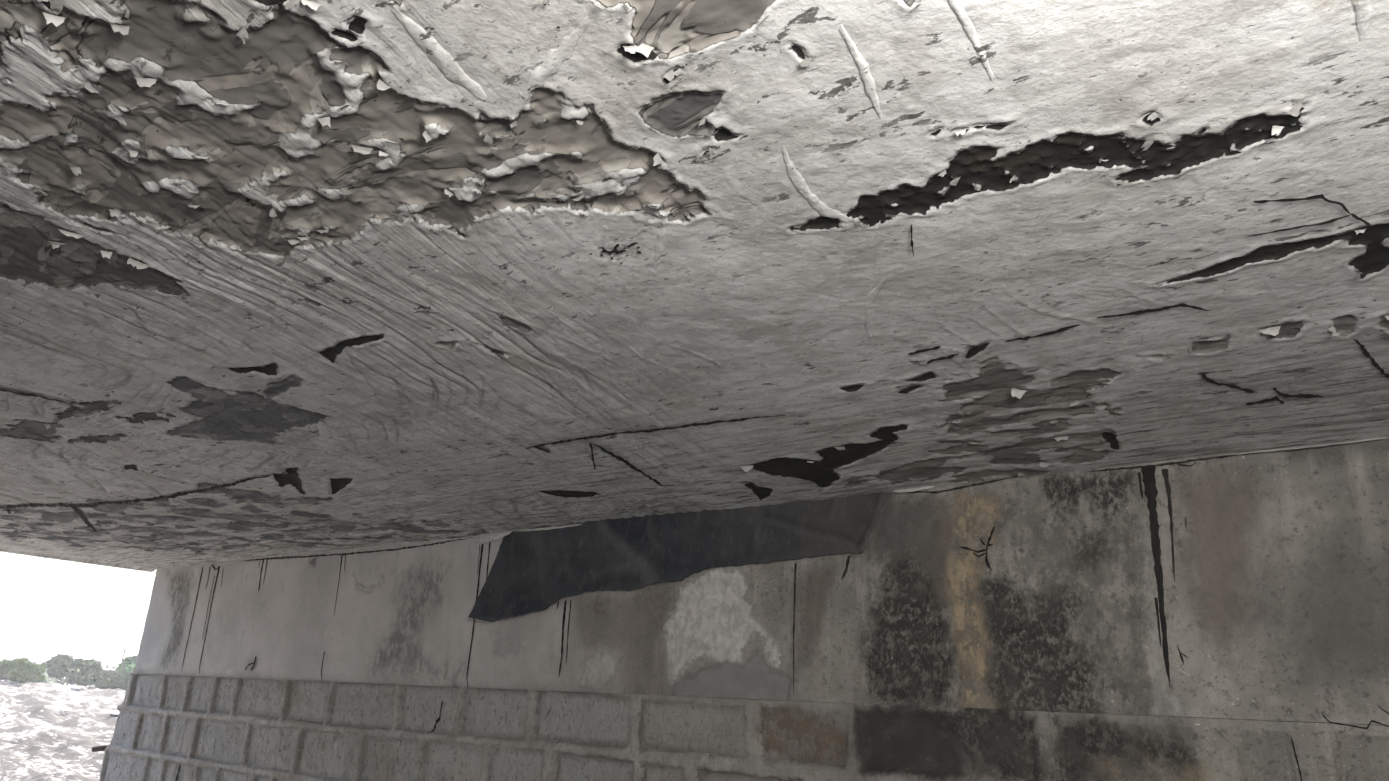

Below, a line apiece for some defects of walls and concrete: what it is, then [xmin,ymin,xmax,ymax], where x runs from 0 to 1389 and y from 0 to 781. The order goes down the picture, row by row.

peeling [590,0,776,156]
peeling [790,45,812,68]
peeling [0,0,708,299]
peeling [790,100,1305,231]
peeling [1157,224,1389,286]
peeling [1257,322,1304,339]
peeling [1328,316,1362,339]
peeling [0,363,333,446]
peeling [740,342,1122,500]
peeling [0,467,488,555]
leakage [1044,471,1143,516]
leakage [854,492,1195,781]